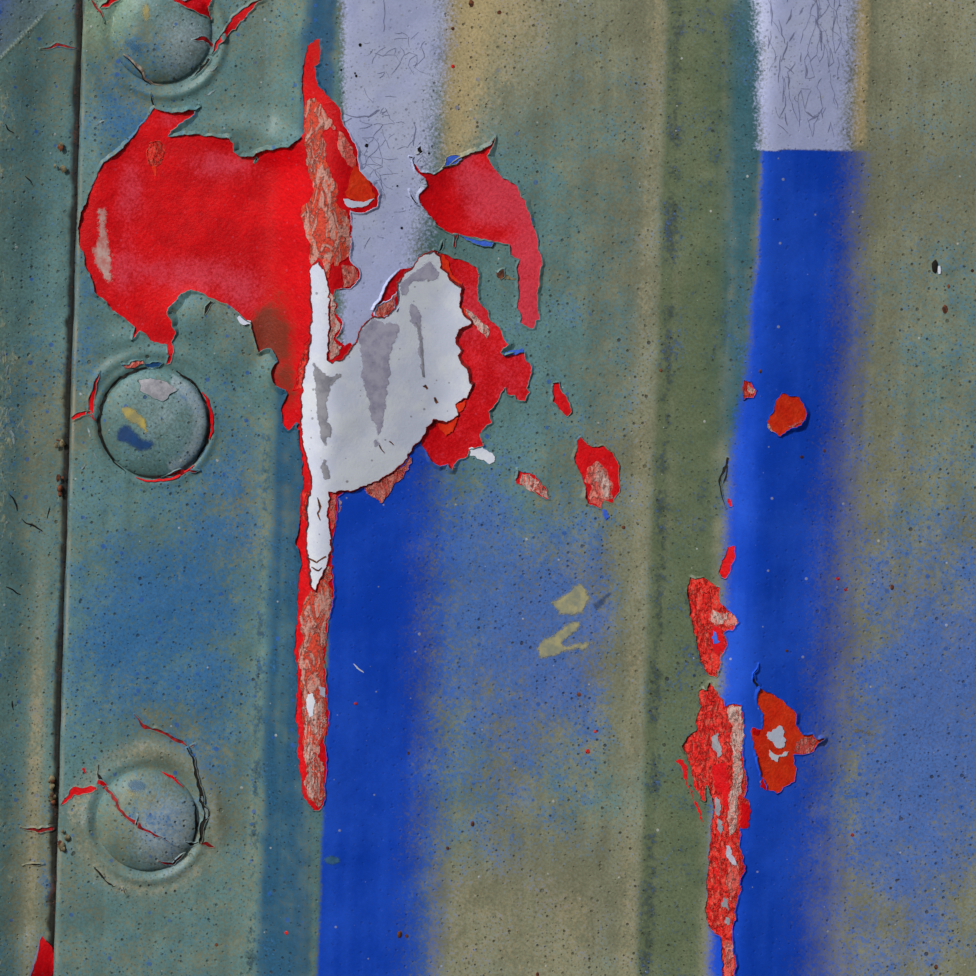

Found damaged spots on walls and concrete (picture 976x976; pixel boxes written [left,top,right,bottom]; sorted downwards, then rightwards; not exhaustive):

peeling [171,0,215,22]
peeling [76,38,551,812]
peeling [549,381,573,418]
peeling [766,392,811,438]
peeling [570,436,621,520]
peeling [676,544,828,976]
crack [19,713,216,866]
crack [21,860,45,868]
crack [93,865,130,899]
peeling [29,936,54,976]